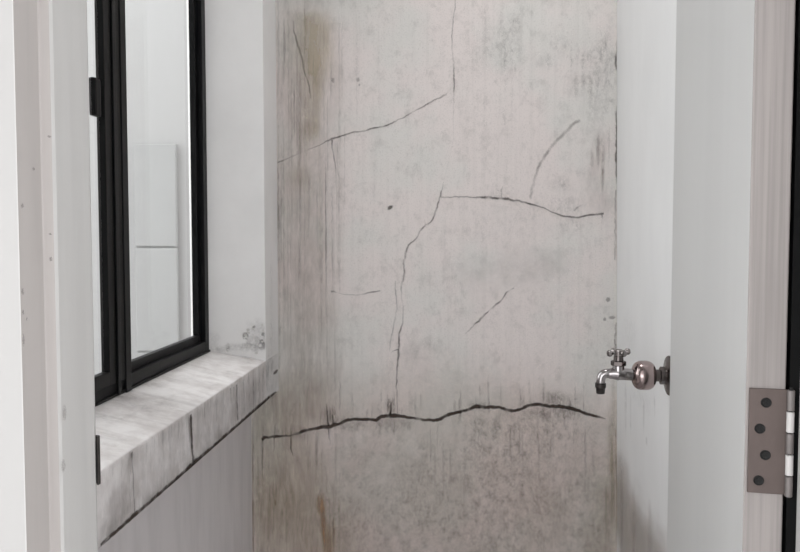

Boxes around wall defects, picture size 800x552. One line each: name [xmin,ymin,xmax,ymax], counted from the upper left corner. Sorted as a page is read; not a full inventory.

crack [470,196,537,206]
crack [262,403,601,451]
crack [101,385,276,546]